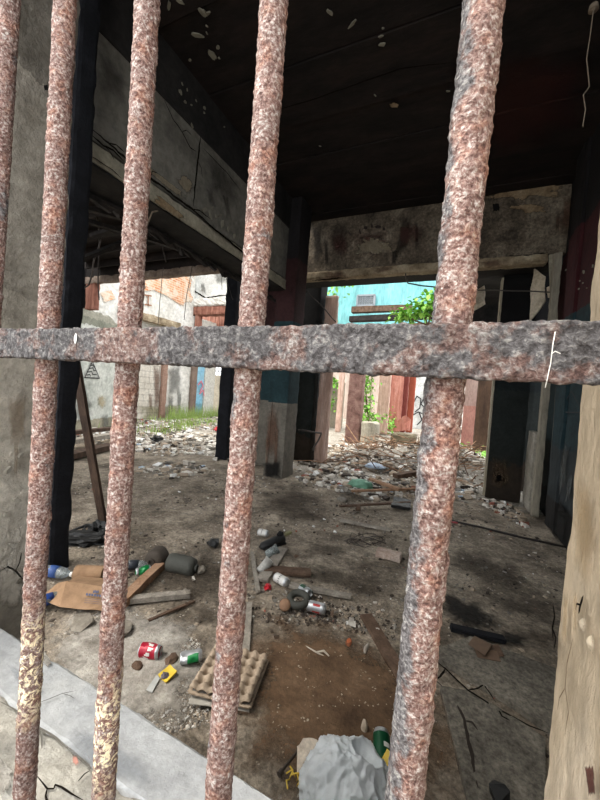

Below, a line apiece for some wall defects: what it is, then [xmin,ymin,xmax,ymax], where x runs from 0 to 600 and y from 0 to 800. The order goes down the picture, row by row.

peeling [191,7,211,38]
crack [93,130,126,178]
crack [151,100,243,253]
corrosion [149,369,159,408]
corrosion [11,402,24,437]
crack [437,606,573,788]